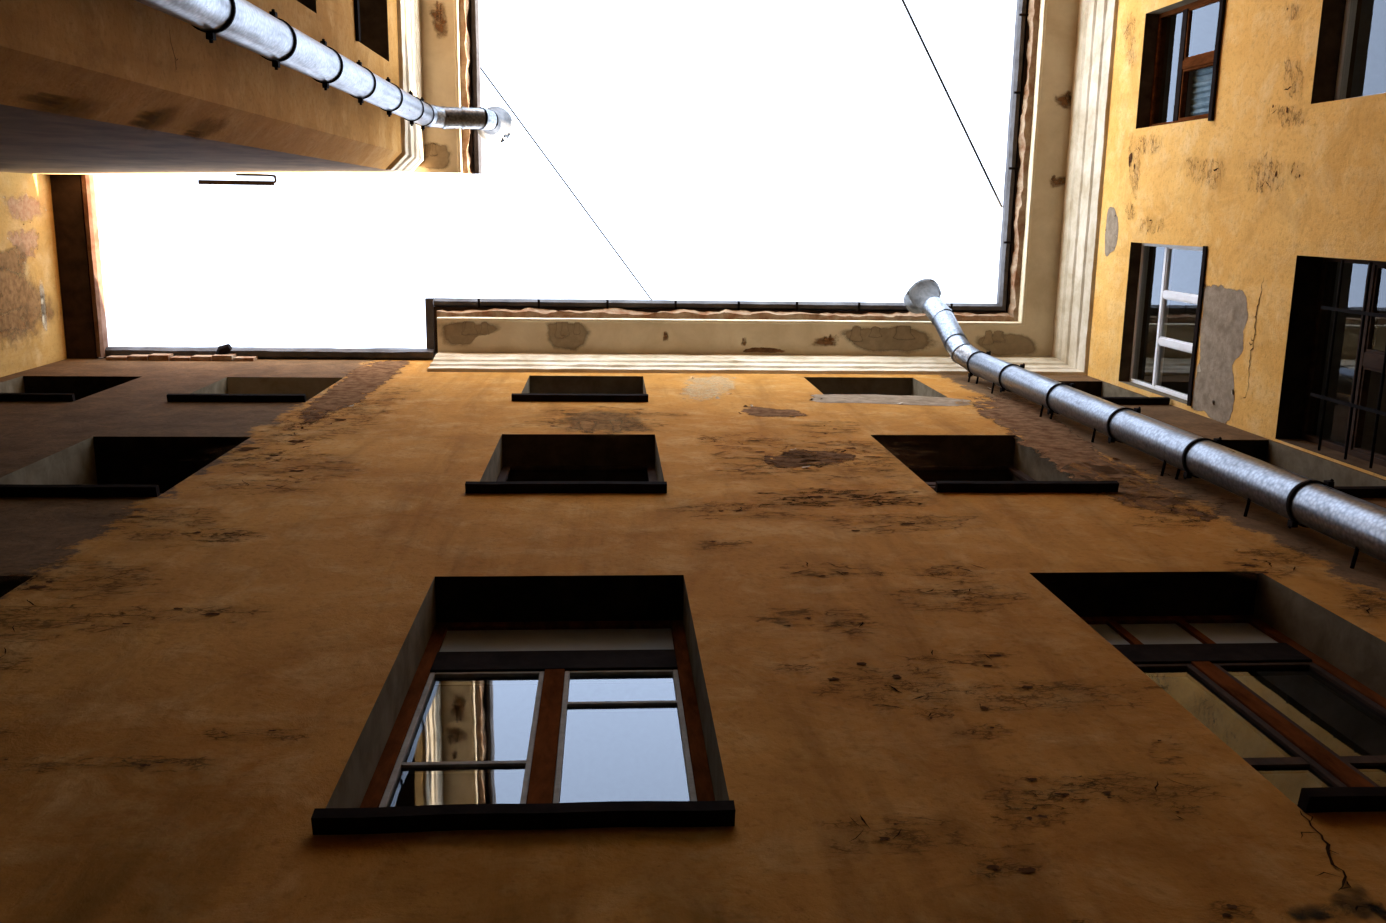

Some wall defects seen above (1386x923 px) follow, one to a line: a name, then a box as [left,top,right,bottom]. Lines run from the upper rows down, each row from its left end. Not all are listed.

flaking render [3,195,47,258]
flaking render [1105,134,1163,256]
flaking render [1191,283,1248,424]
crack [1300,811,1373,910]